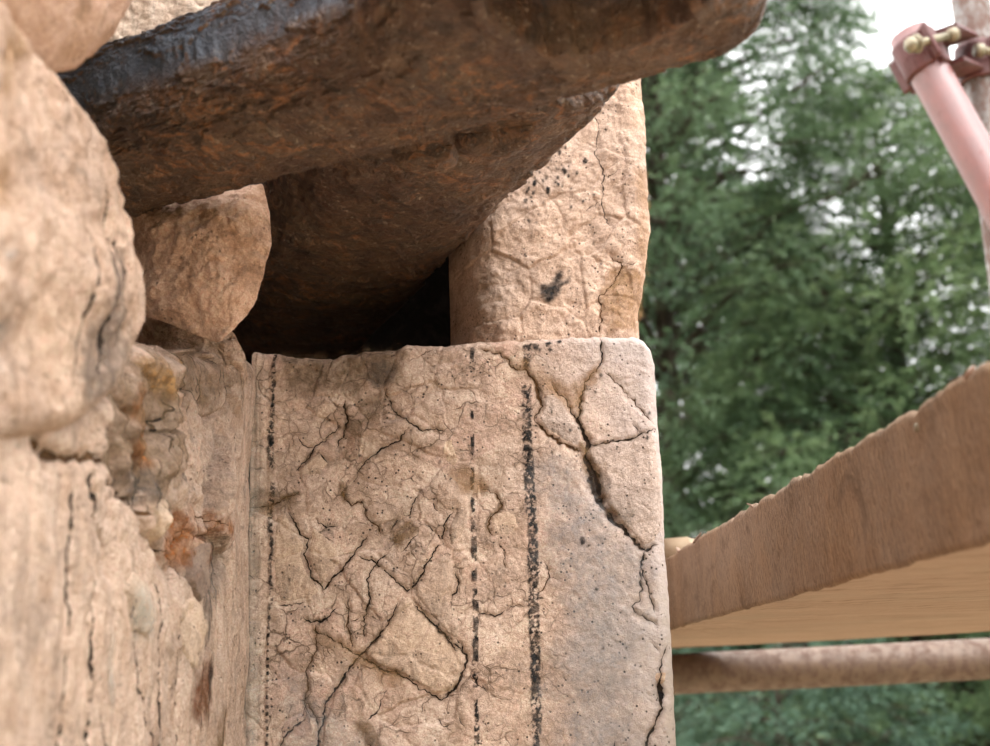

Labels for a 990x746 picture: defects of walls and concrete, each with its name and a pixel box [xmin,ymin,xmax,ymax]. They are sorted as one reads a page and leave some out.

crack [587,118,617,226]
crack [29,437,154,746]
crack [145,399,175,451]
crack [124,516,228,746]
crack [250,393,487,746]
crack [480,256,667,746]